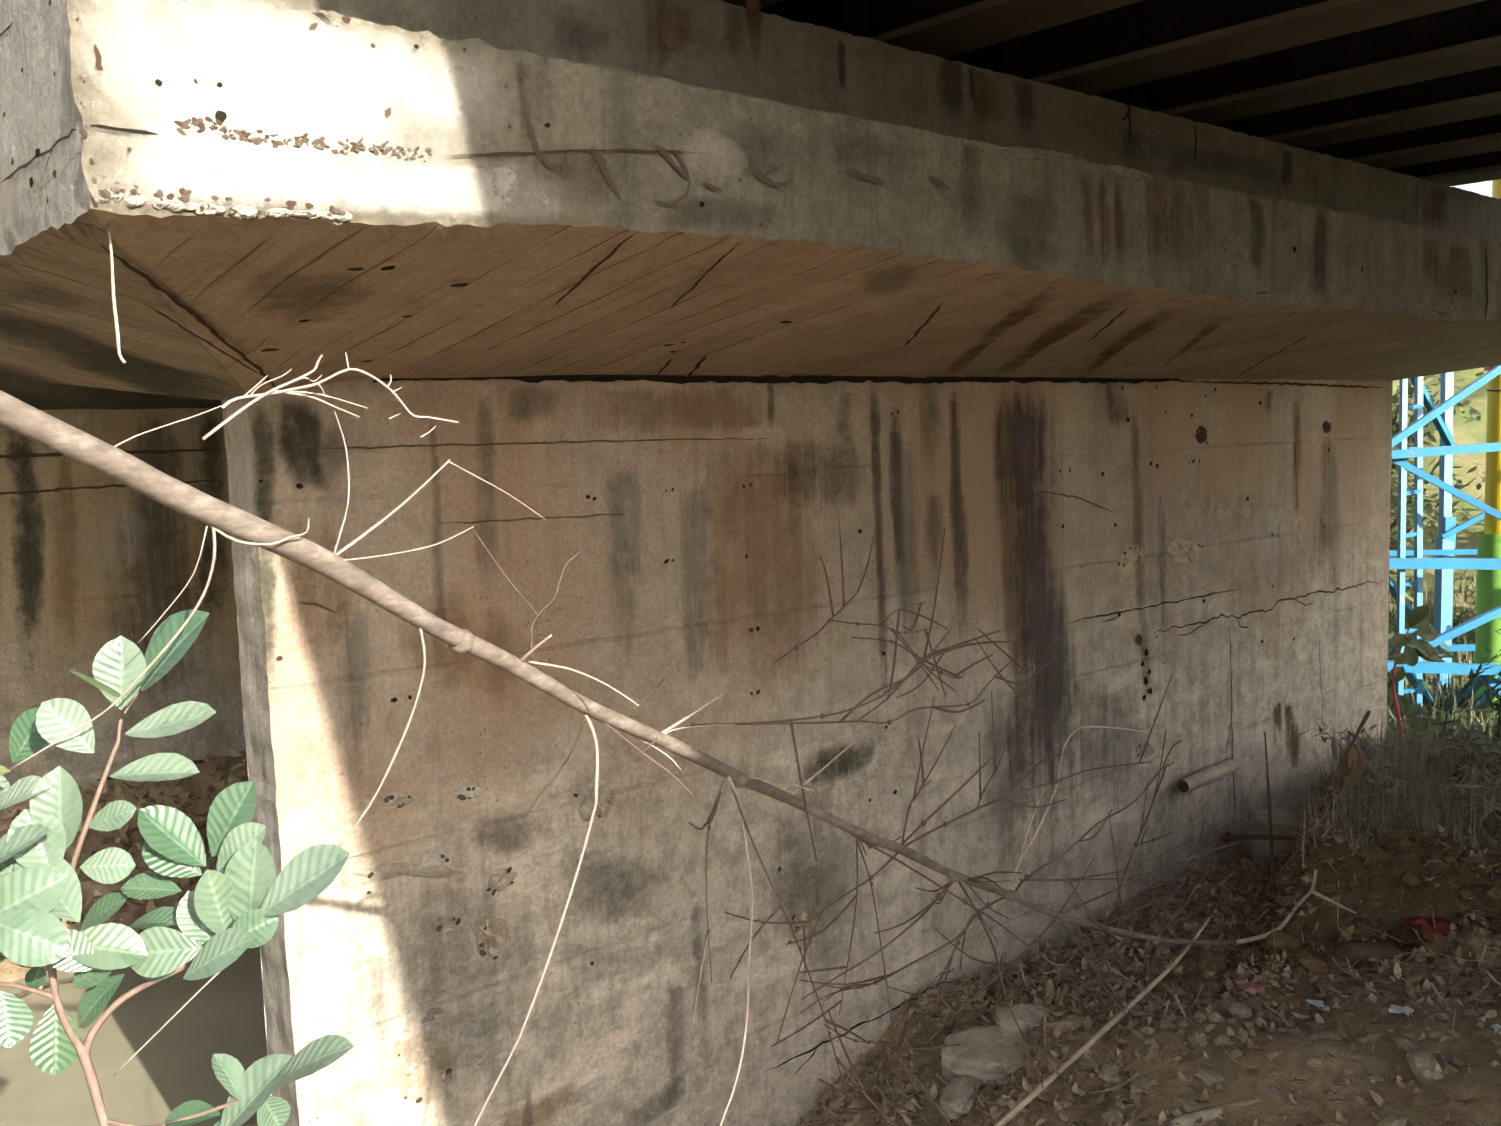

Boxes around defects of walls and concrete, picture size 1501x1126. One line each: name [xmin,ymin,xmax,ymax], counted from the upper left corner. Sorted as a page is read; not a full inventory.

crack [1,125,158,183]
spalling [66,0,353,222]
peeling [174,116,432,163]
crack [553,231,640,307]
crack [373,302,1381,389]
leakage [9,436,44,626]
leakage [871,400,902,620]
leakage [951,403,967,567]
leakage [999,393,1066,804]
leakage [816,747,870,778]
crack [1068,580,1383,815]
crack [763,968,962,1075]